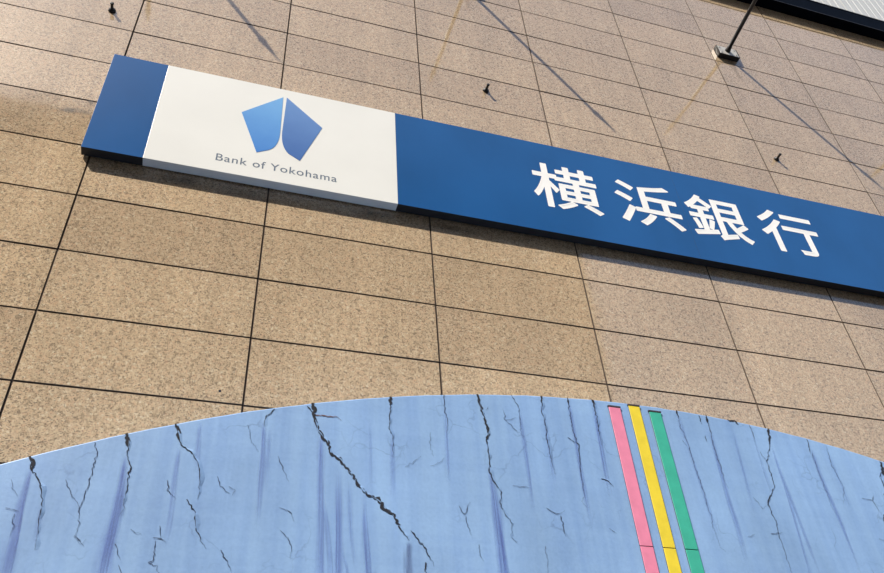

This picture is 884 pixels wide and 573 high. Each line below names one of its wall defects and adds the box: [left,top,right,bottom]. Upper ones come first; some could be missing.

crack [28,445,98,550]
crack [120,433,133,531]
crack [167,423,235,570]
crack [307,403,433,573]
crack [388,396,448,466]
crack [476,394,529,542]
crack [540,396,614,536]
crack [807,439,884,521]